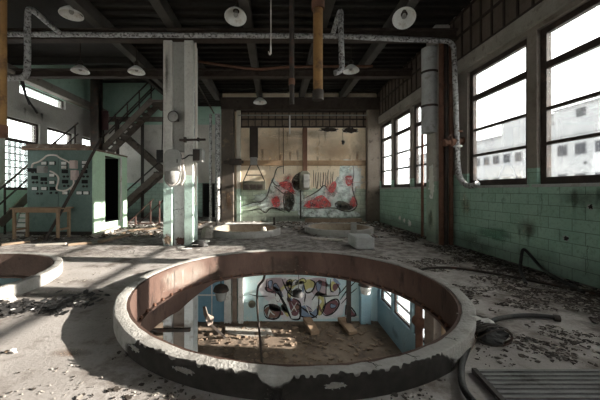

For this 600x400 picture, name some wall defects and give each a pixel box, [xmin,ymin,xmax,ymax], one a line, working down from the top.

peeling [107,373,210,400]
spalling [324,382,347,390]